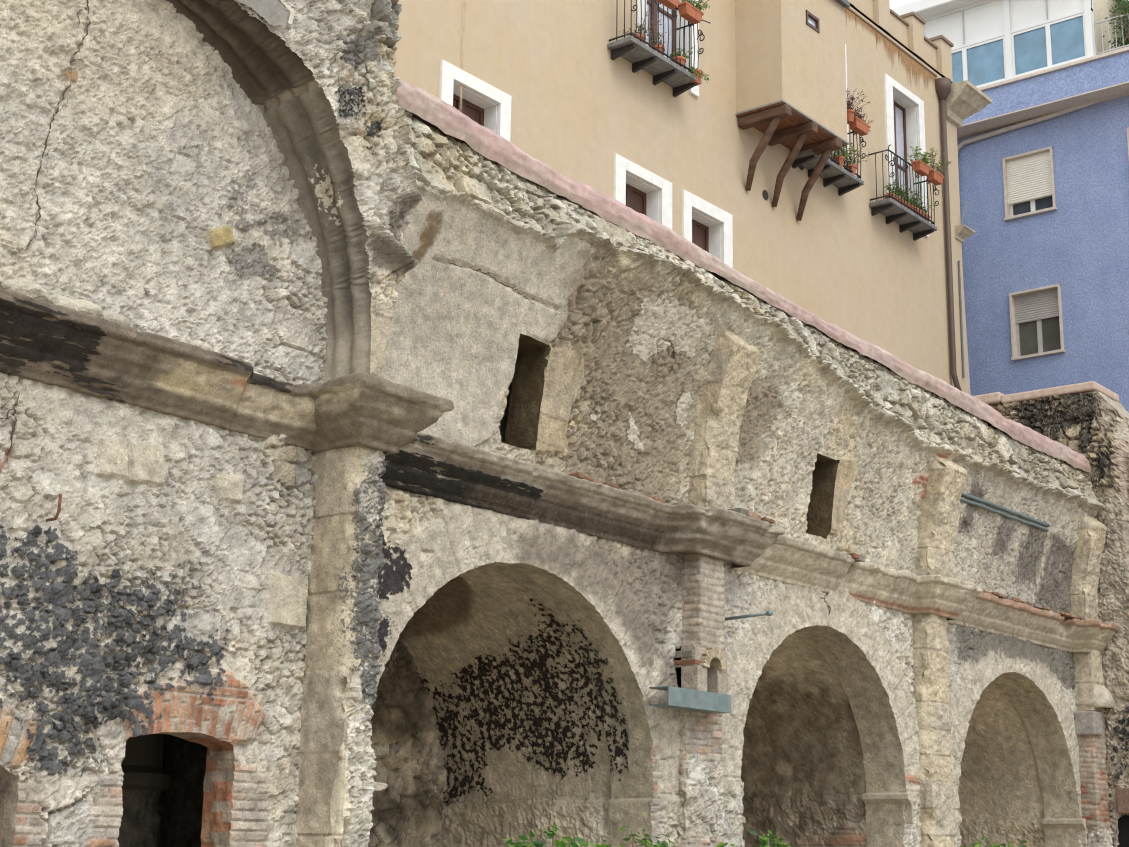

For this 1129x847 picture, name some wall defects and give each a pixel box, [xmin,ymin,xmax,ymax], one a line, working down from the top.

crack [14,0,91,254]
leakage [0,517,231,777]
leakage [332,459,427,739]
leakage [368,783,441,842]
leakage [548,609,638,782]